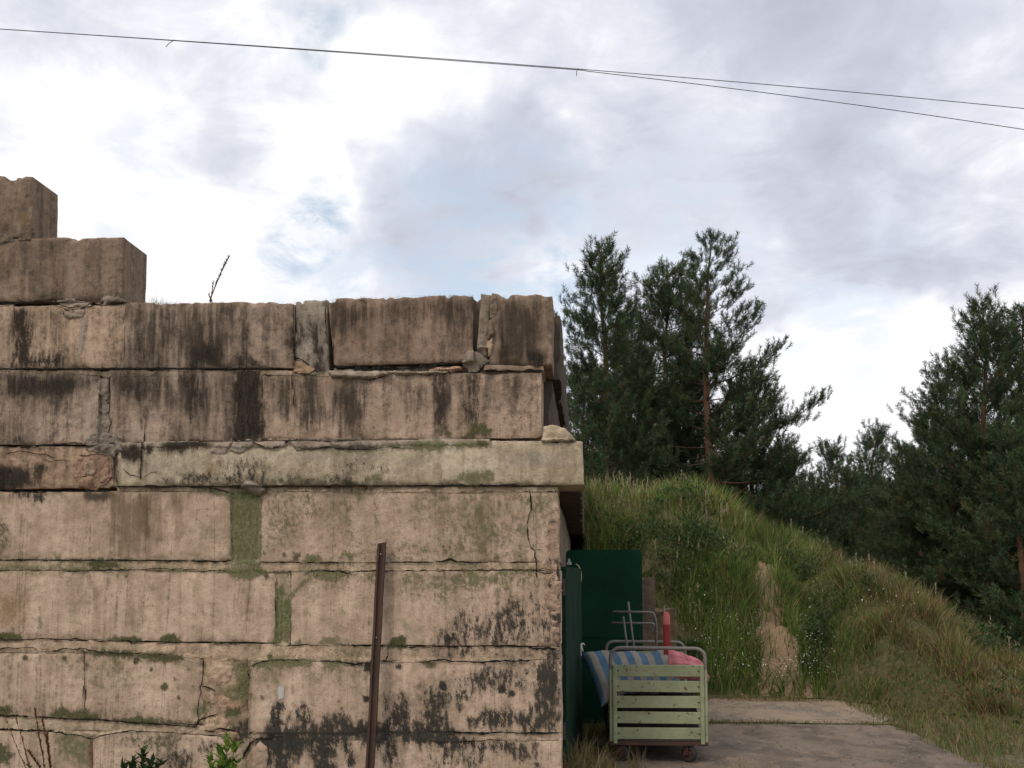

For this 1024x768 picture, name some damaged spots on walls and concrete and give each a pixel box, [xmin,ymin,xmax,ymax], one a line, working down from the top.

damp [6,308,95,401]
damp [112,305,265,443]
damp [284,322,334,425]
damp [429,373,484,429]
damp [493,297,546,367]
damp [84,438,397,548]
crack [0,426,559,578]
damp [162,560,561,768]